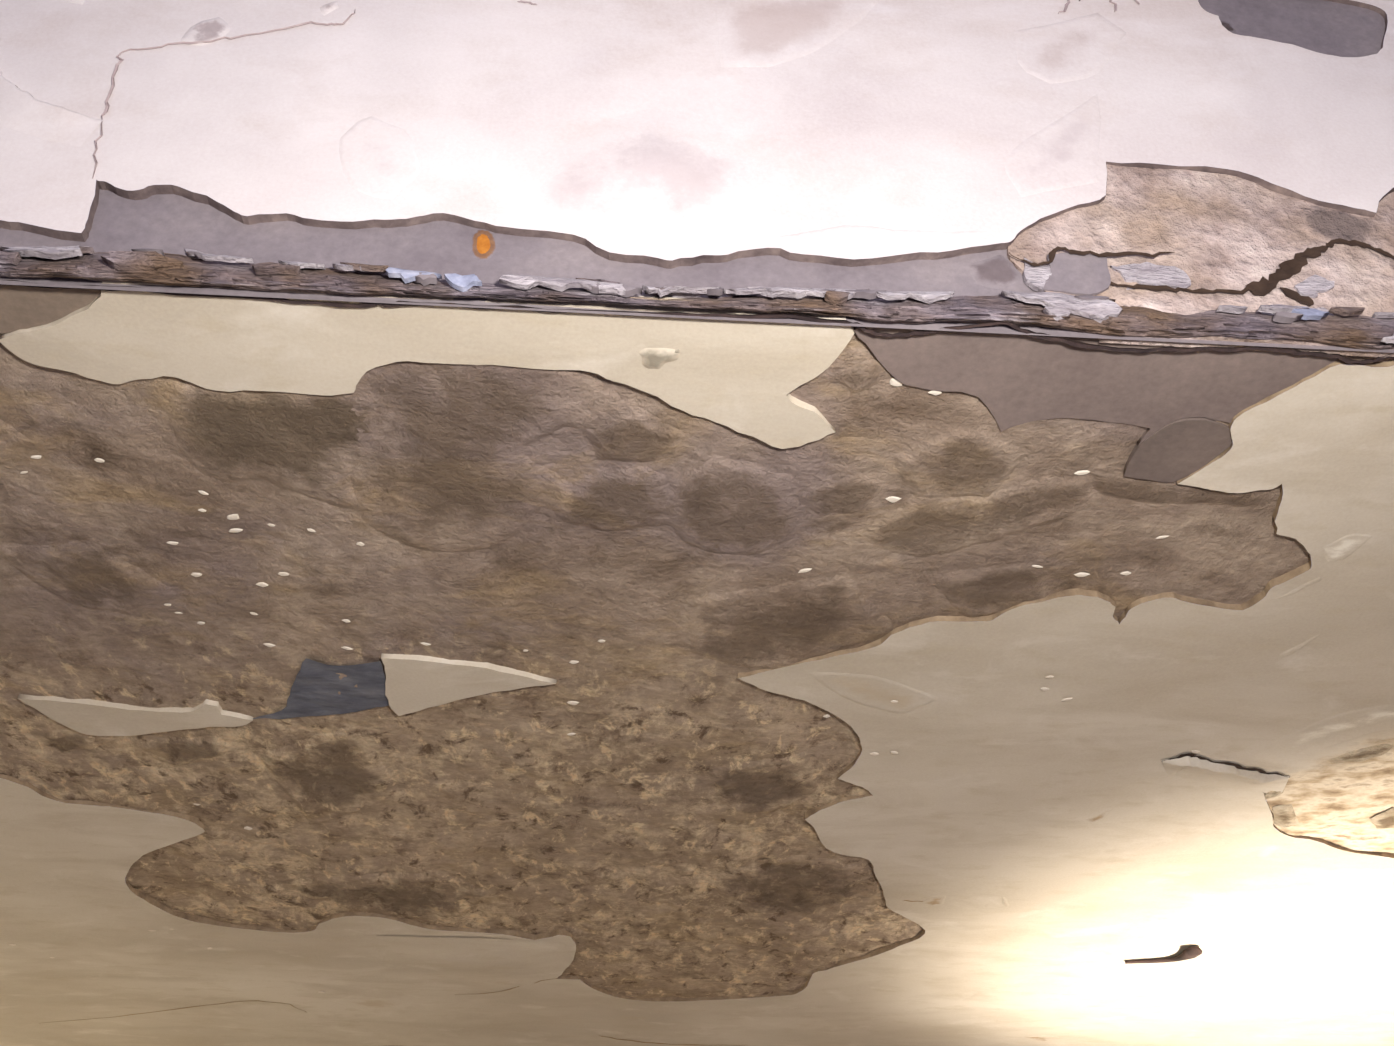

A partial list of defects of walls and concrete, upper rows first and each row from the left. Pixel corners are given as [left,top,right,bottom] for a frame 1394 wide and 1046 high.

crack [0,12,355,177]
crack [1058,0,1139,14]
flaking render [1198,0,1388,57]
corrosion [471,229,496,260]
flaking render [0,162,1394,364]
flaking render [0,284,1394,1002]